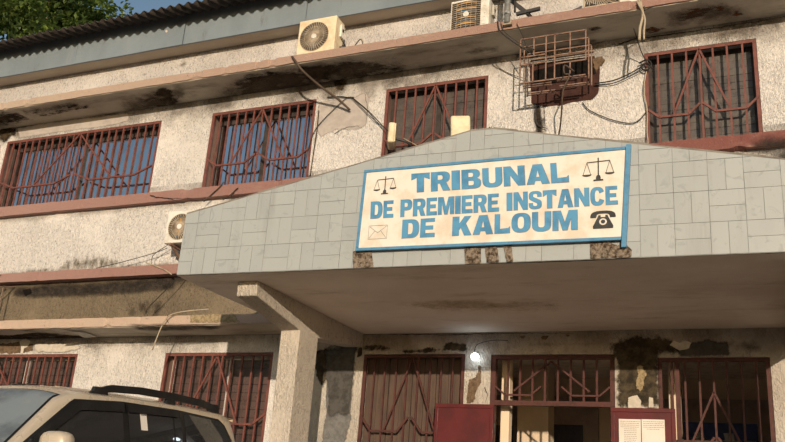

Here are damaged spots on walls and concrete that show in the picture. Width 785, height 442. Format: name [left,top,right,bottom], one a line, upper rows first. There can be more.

leakage [127,88,184,110]
leakage [0,104,88,126]
leakage [534,104,545,133]
peeling [353,251,373,268]
peeling [464,245,513,264]
peeling [590,241,632,259]
peeling [0,339,80,354]